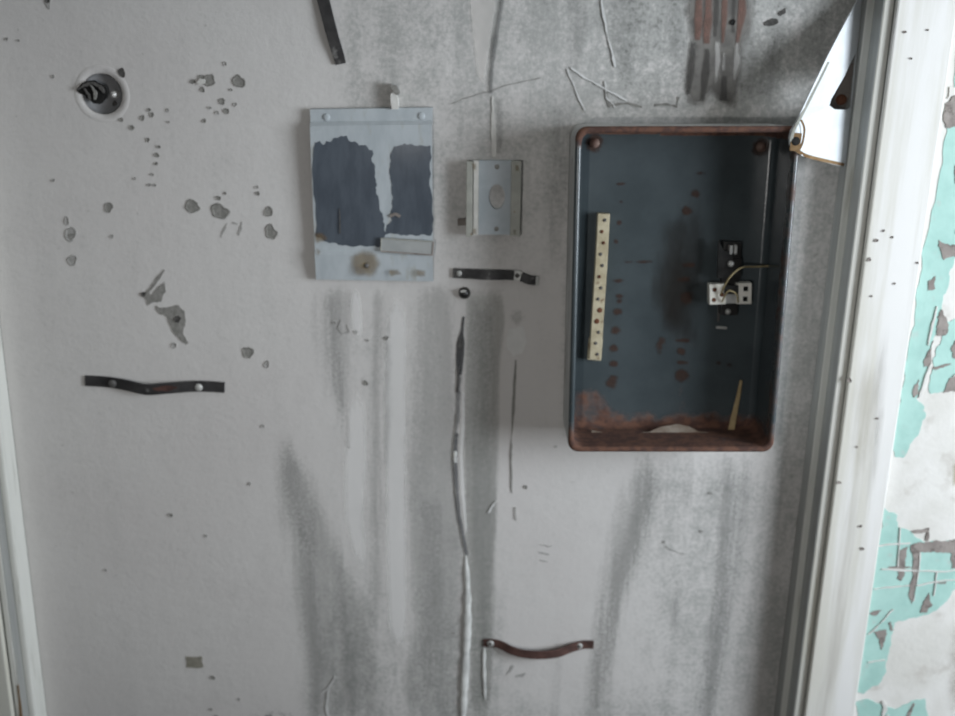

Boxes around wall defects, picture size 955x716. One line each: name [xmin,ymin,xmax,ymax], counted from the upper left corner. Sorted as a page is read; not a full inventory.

flaking render [190,74,215,92]
flaking render [202,74,246,123]
flaking render [64,216,76,242]
flaking render [185,192,243,237]
flaking render [264,206,278,240]
peeling [893,75,955,458]
flaking render [141,270,189,349]
flaking render [242,347,254,359]
peeling [856,508,955,716]